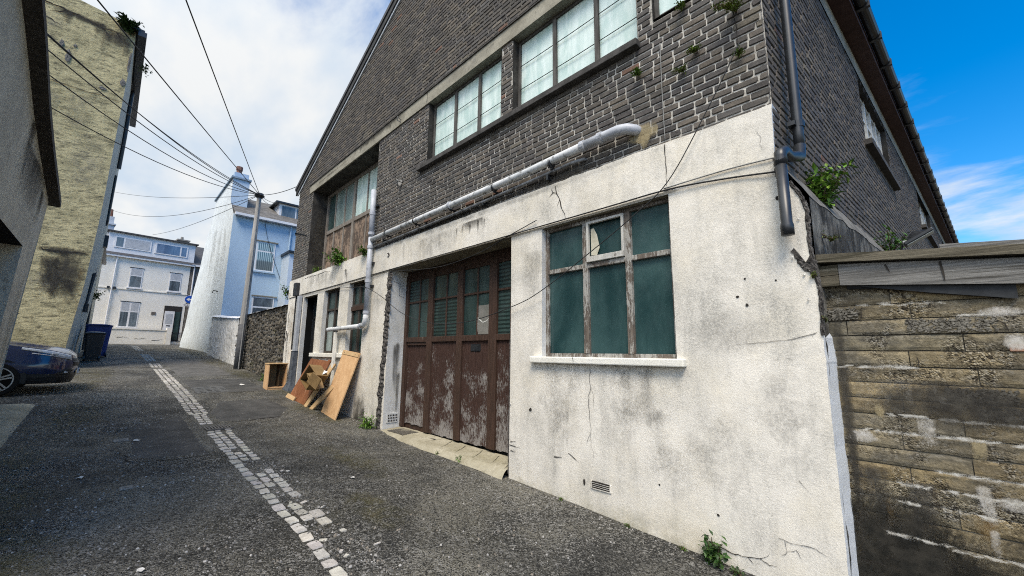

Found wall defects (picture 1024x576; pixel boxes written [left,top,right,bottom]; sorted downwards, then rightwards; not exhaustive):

leakage [42,246,85,297]
spalling [789,180,858,336]
crack [572,357,594,458]
leakage [837,326,1024,576]
crack [721,538,826,567]